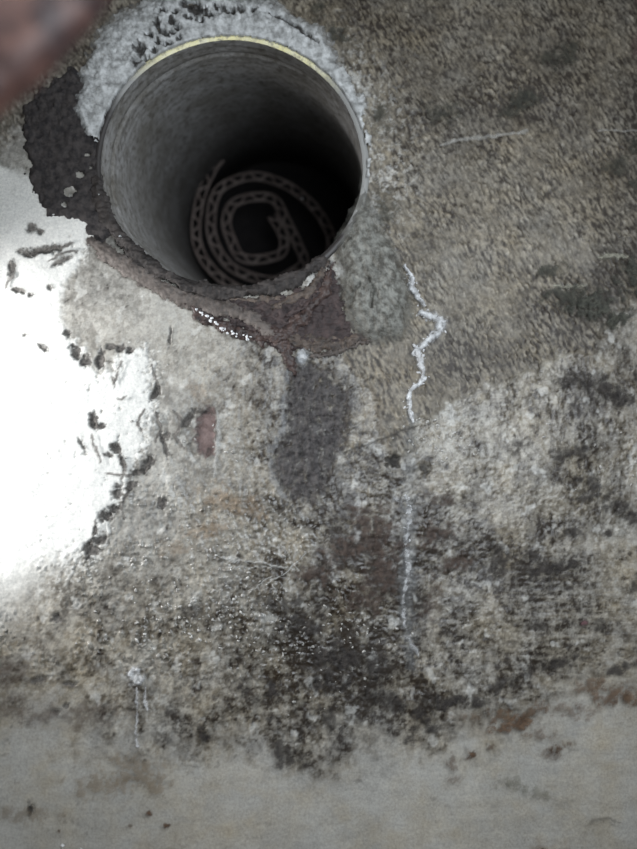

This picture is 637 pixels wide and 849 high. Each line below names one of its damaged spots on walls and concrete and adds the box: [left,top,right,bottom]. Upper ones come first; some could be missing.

mould [554,372,635,406]
mould [552,445,588,463]
leakage [431,495,454,506]
mould [571,477,637,525]
leakage [236,505,407,637]
leakage [492,543,510,576]
leakage [520,551,577,581]
mould [543,652,592,671]
mould [607,661,636,675]
efflorescence [128,667,148,747]
mould [367,687,491,746]
mould [273,740,307,769]